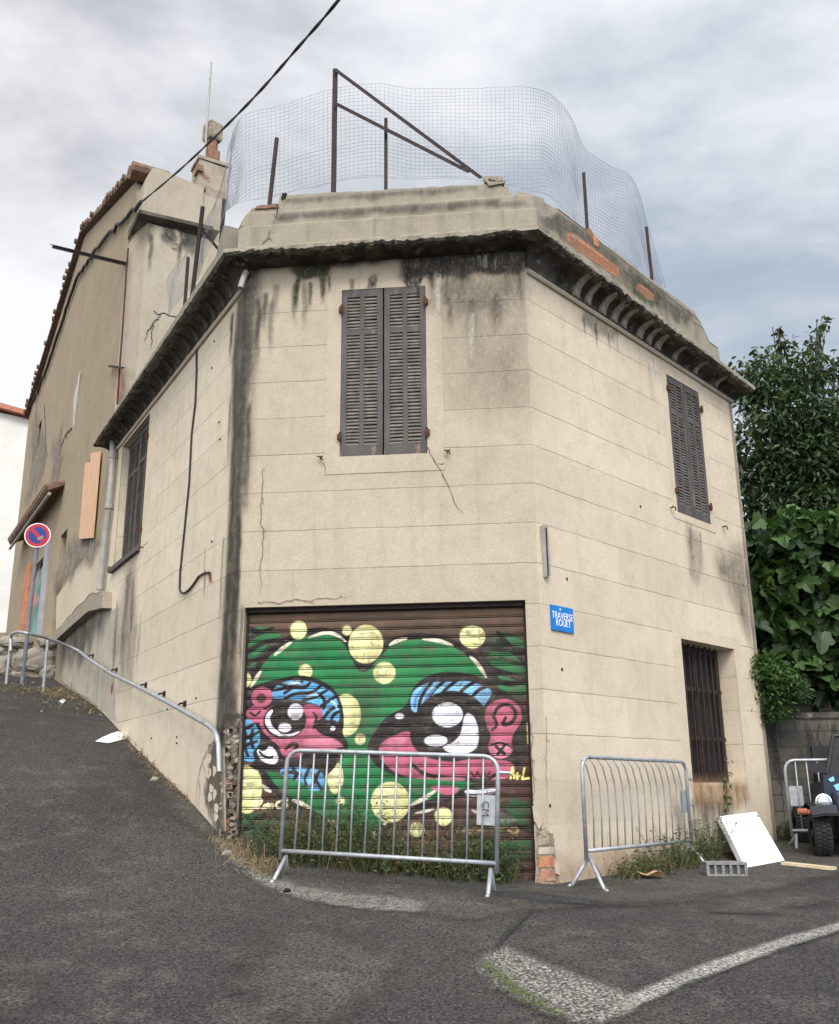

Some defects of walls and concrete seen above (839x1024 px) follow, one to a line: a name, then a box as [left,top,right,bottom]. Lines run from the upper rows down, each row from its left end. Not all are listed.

leakage [162,226,197,251]
leakage [293,259,381,304]
leakage [402,249,527,295]
crack [145,315,161,350]
leakage [204,267,269,833]
crack [256,468,349,604]
spalling [206,713,243,839]
spalling [532,804,560,884]